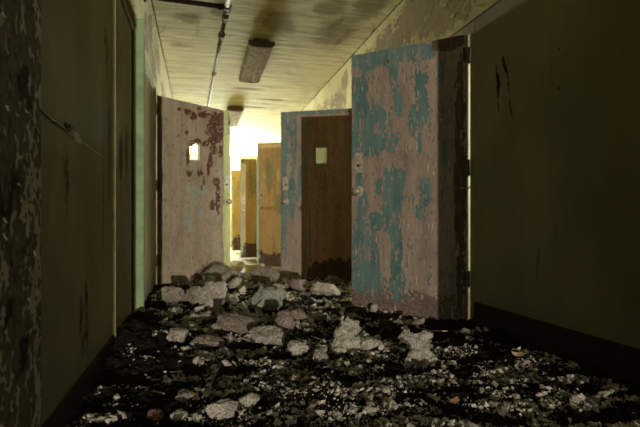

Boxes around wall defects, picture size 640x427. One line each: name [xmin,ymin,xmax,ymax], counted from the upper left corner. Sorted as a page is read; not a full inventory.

crack [41,109,107,160]
peeling [248,0,481,321]